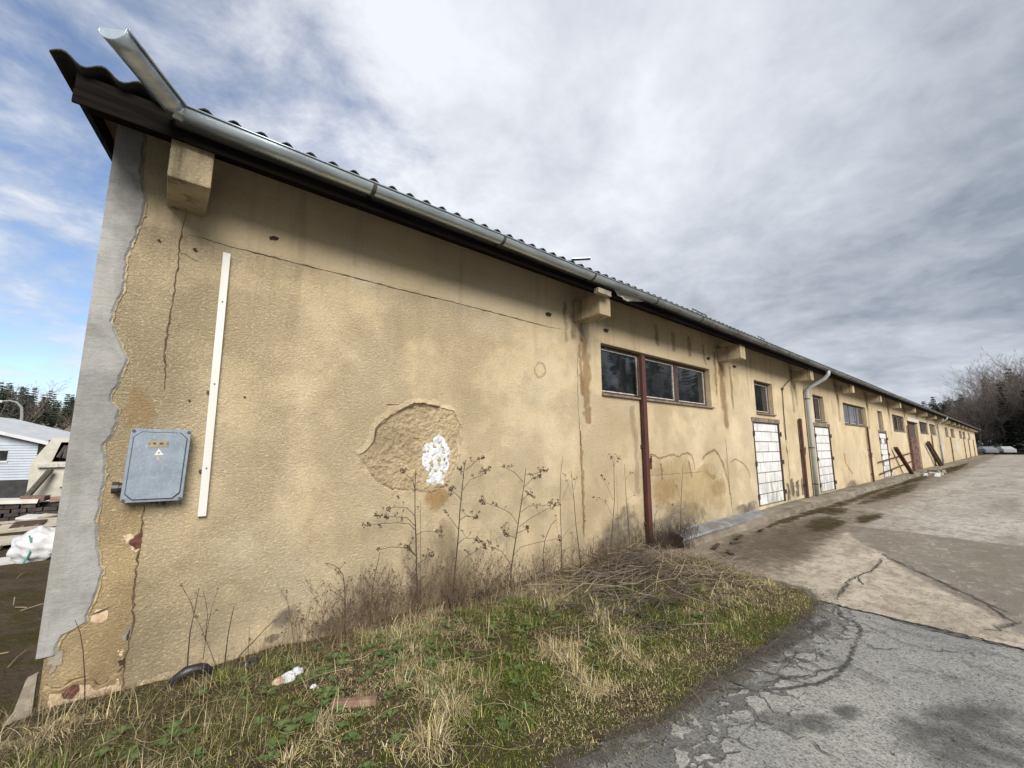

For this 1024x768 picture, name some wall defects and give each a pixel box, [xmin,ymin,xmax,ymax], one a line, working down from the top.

crack [163,218,558,389]
corrosion [579,340,591,423]
spalling [124,532,143,554]
crack [46,506,145,689]
spalling [90,608,108,624]
crack [691,554,1021,694]
spalling [42,628,132,708]